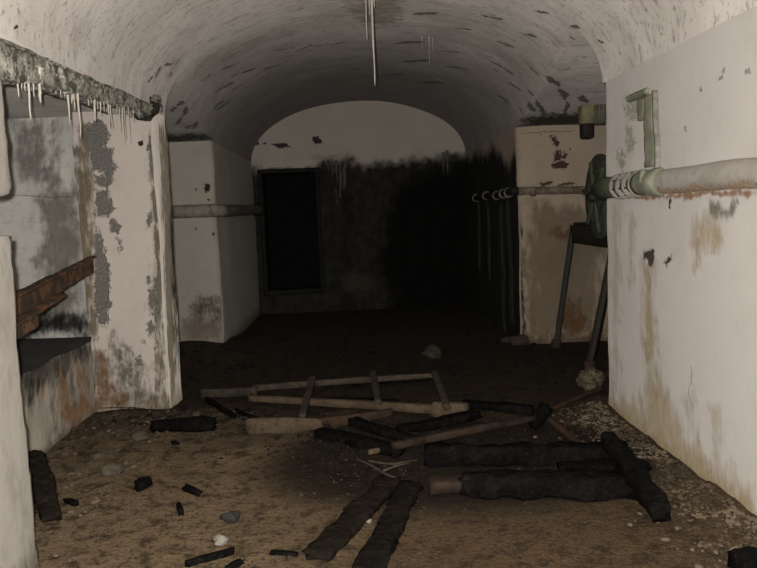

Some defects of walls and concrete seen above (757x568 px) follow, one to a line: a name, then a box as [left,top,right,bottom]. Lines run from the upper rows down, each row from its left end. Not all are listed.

damp [17,123,96,276]
peeling [84,119,123,328]
damp [114,127,212,405]
damp [255,147,526,336]
peeling [549,134,573,170]
spalling [643,248,655,268]
corrosion [636,181,757,200]
damp [710,204,734,215]
damp [24,274,99,406]
damp [623,385,711,479]